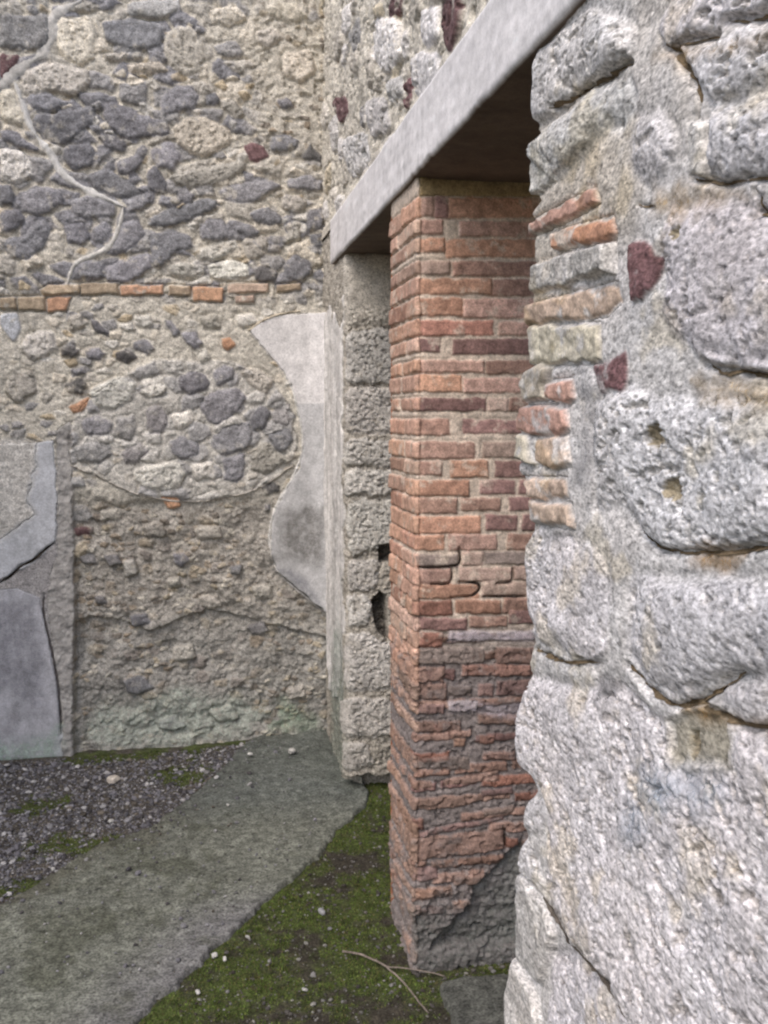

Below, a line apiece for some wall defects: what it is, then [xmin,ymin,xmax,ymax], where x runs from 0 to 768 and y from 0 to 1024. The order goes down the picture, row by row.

crack [0,0,124,284]
crack [1,543,54,582]
crack [42,594,62,733]
spalling [0,295,347,759]
spalling [371,592,385,635]
spalling [378,544,391,560]
spalling [430,838,521,949]